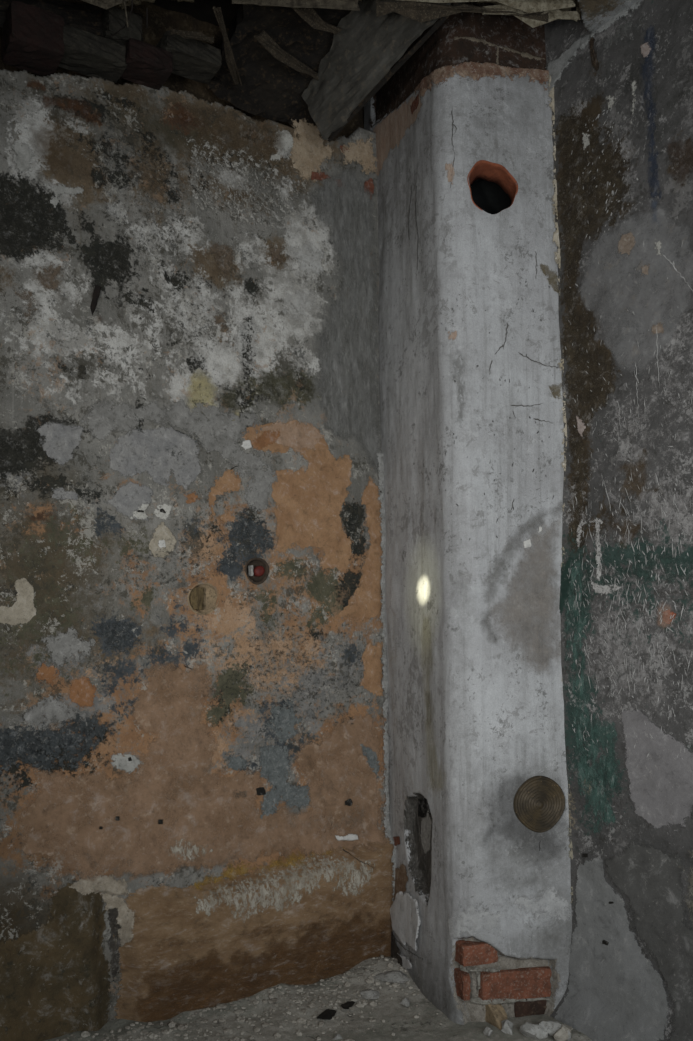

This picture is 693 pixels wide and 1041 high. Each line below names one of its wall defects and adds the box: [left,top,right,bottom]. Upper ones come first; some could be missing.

flaking render [269,2,549,200]
leakage [642,25,693,205]
leakage [0,172,67,260]
leakage [39,128,304,309]
leakage [163,269,213,370]
leakage [222,317,313,408]
leakage [540,105,631,551]
leakage [493,517,555,669]
flaking render [19,399,432,981]
peeling [559,544,693,837]
flaking render [449,936,561,1030]